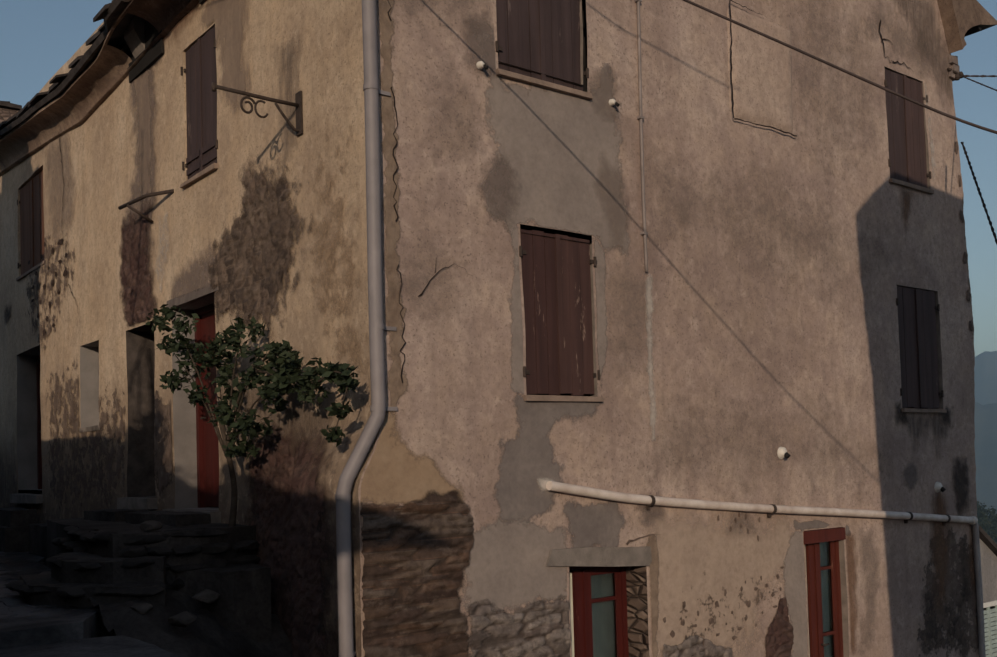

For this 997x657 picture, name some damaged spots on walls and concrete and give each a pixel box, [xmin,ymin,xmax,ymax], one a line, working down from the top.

crack [879,19,914,72]
peeling [25,233,75,351]
spalling [208,161,363,370]
crack [418,258,472,297]
peeling [44,361,125,508]
spalling [360,490,571,657]
peeling [651,512,794,657]
peeling [917,528,979,657]